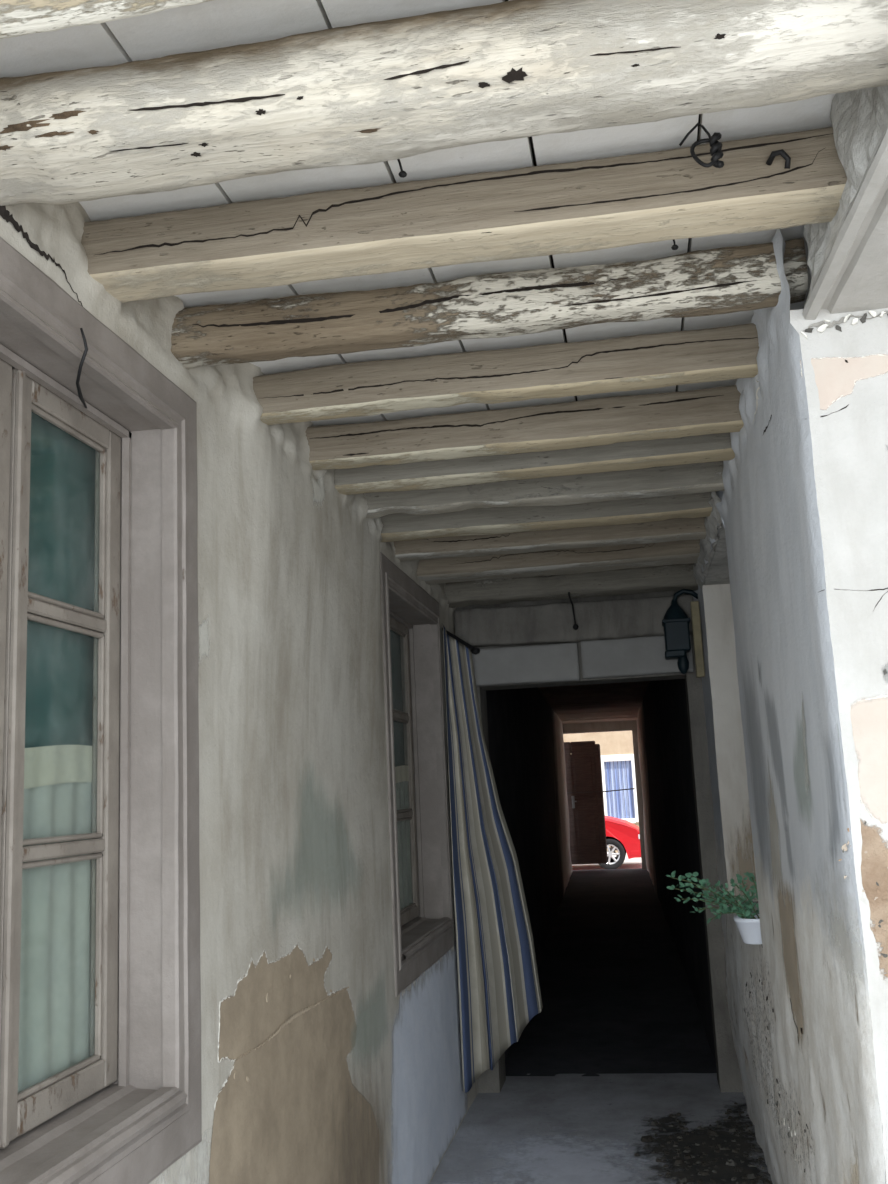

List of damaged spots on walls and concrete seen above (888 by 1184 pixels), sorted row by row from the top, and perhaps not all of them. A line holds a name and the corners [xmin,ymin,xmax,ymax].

crack [0,206,82,305]
peeling [800,354,888,417]
peeling [838,695,888,979]
peeling [209,943,383,1184]